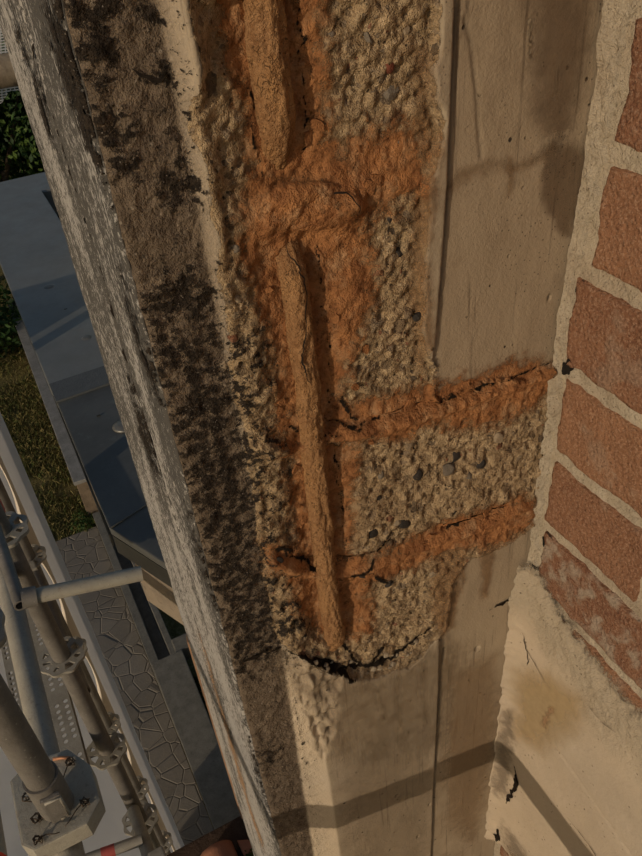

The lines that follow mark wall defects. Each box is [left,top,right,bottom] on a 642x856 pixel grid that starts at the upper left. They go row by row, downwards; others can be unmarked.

damp [39,0,213,225]
crack [296,8,312,163]
damp [544,149,584,231]
damp [115,247,317,707]
crack [274,547,316,572]
spalling [188,0,446,680]
rust [216,0,558,642]
crack [285,244,549,584]
spalling [328,392,548,568]
crack [242,626,434,778]
crack [506,767,518,804]